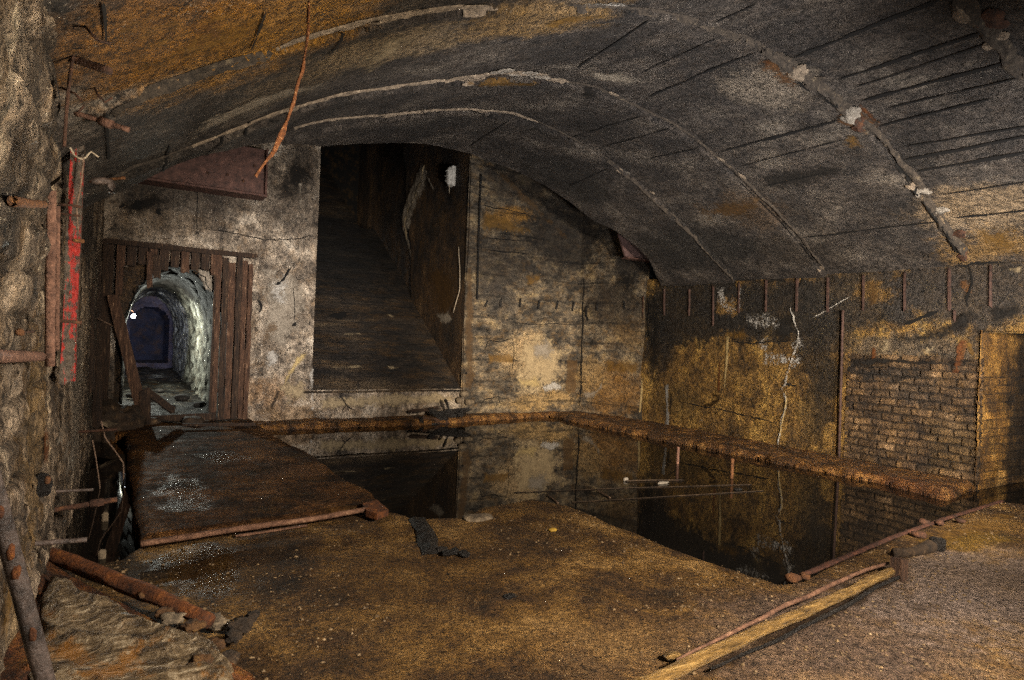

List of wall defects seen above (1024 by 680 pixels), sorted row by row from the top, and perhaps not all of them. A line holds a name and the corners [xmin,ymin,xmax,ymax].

peeling [778,55,809,82]
peeling [839,106,865,132]
peeling [905,181,932,197]